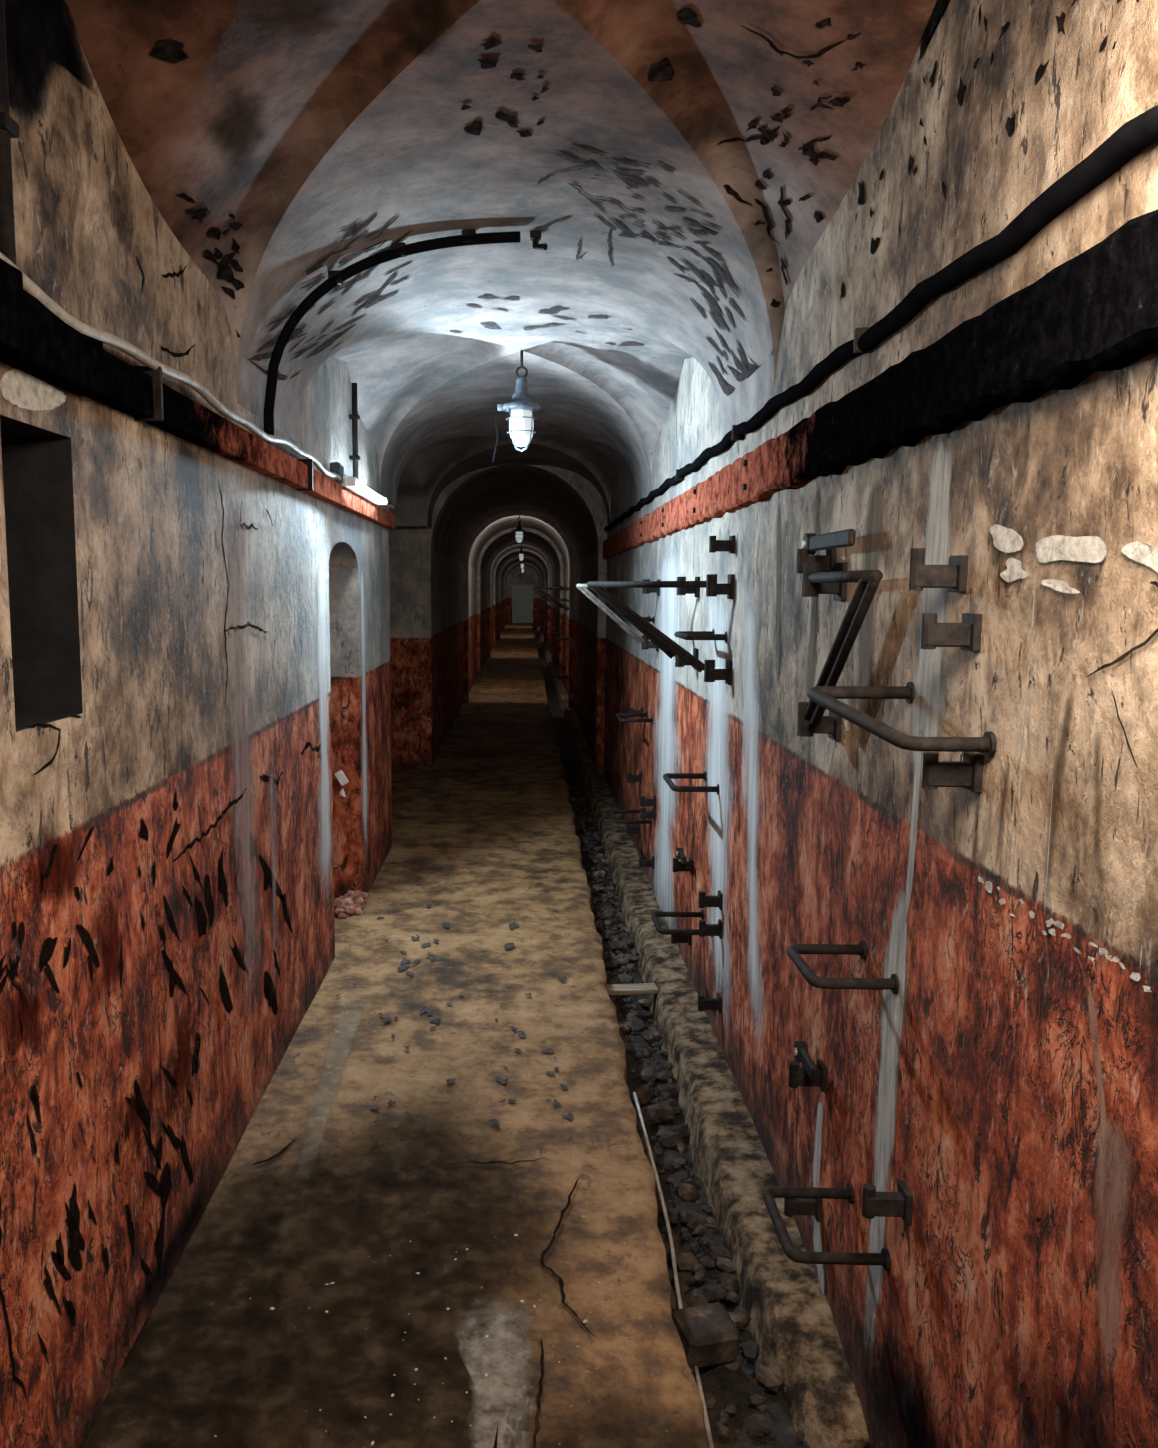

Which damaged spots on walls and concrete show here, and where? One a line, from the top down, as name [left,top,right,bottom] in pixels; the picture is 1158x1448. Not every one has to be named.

spalling [149,39,188,64]
spalling [648,57,674,81]
spalling [678,8,702,27]
spalling [990,524,1158,594]
crack [1087,628,1158,769]
crack [172,741,322,992]
crack [253,1139,296,1165]
crack [469,1156,546,1164]
crack [540,1179,596,1337]
crack [0,1195,27,1399]
crack [533,1338,544,1448]